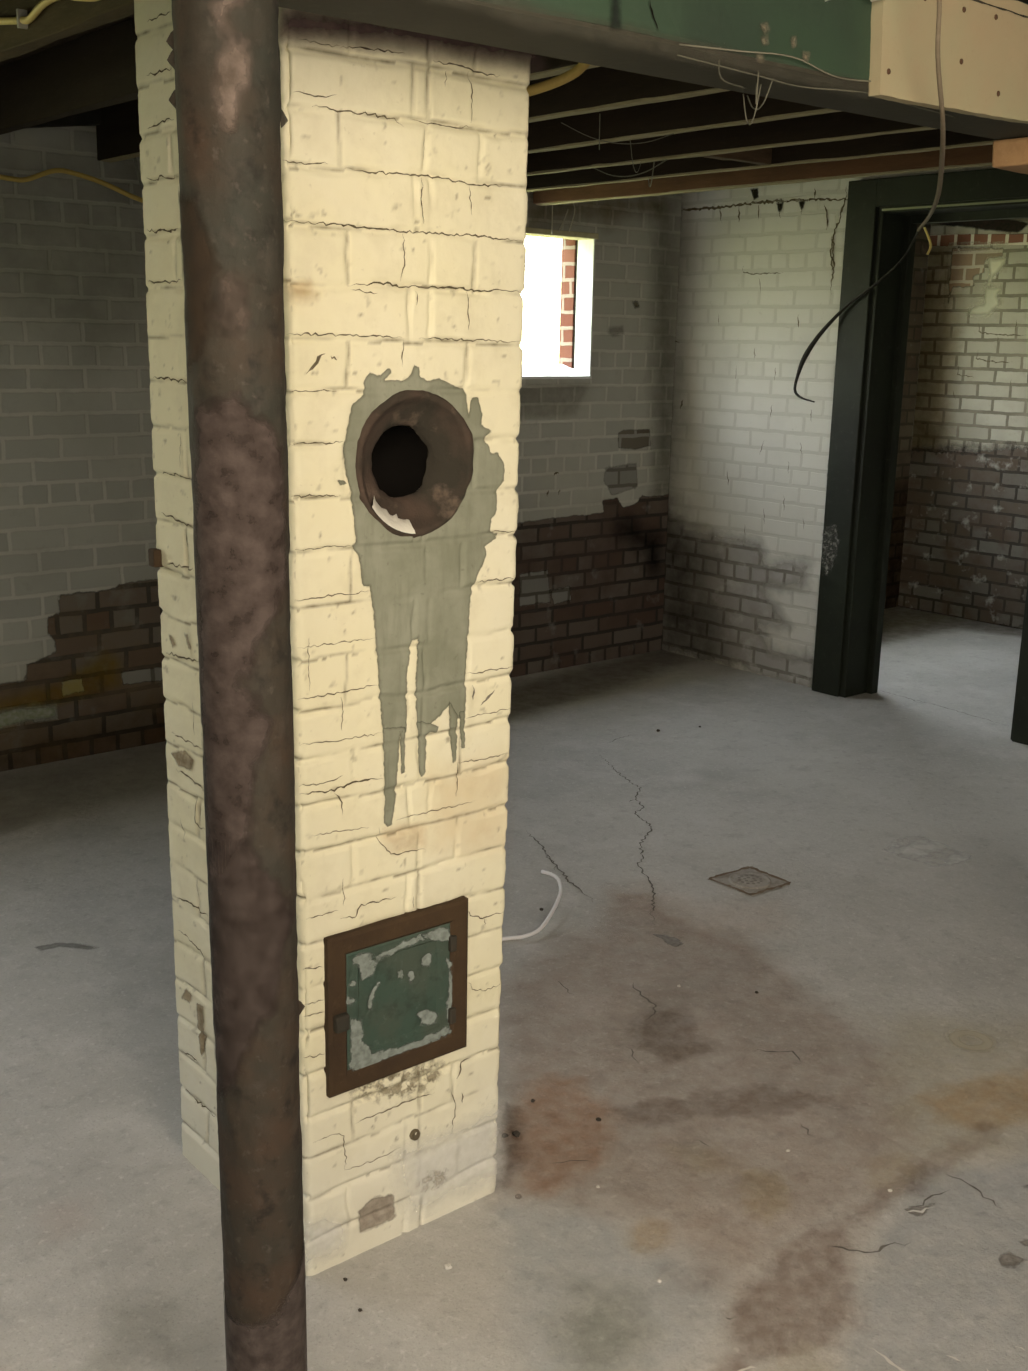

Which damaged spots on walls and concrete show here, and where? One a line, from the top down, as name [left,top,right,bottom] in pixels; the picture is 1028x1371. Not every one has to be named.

rust [166,31,175,70]
rust [214,0,251,132]
rust [178,192,250,365]
crack [284,39,521,365]
peeling [884,219,1028,629]
peeling [509,429,813,688]
peeling [0,579,194,772]
rust [194,393,294,1095]
crack [605,734,656,925]
rust [223,1241,307,1371]